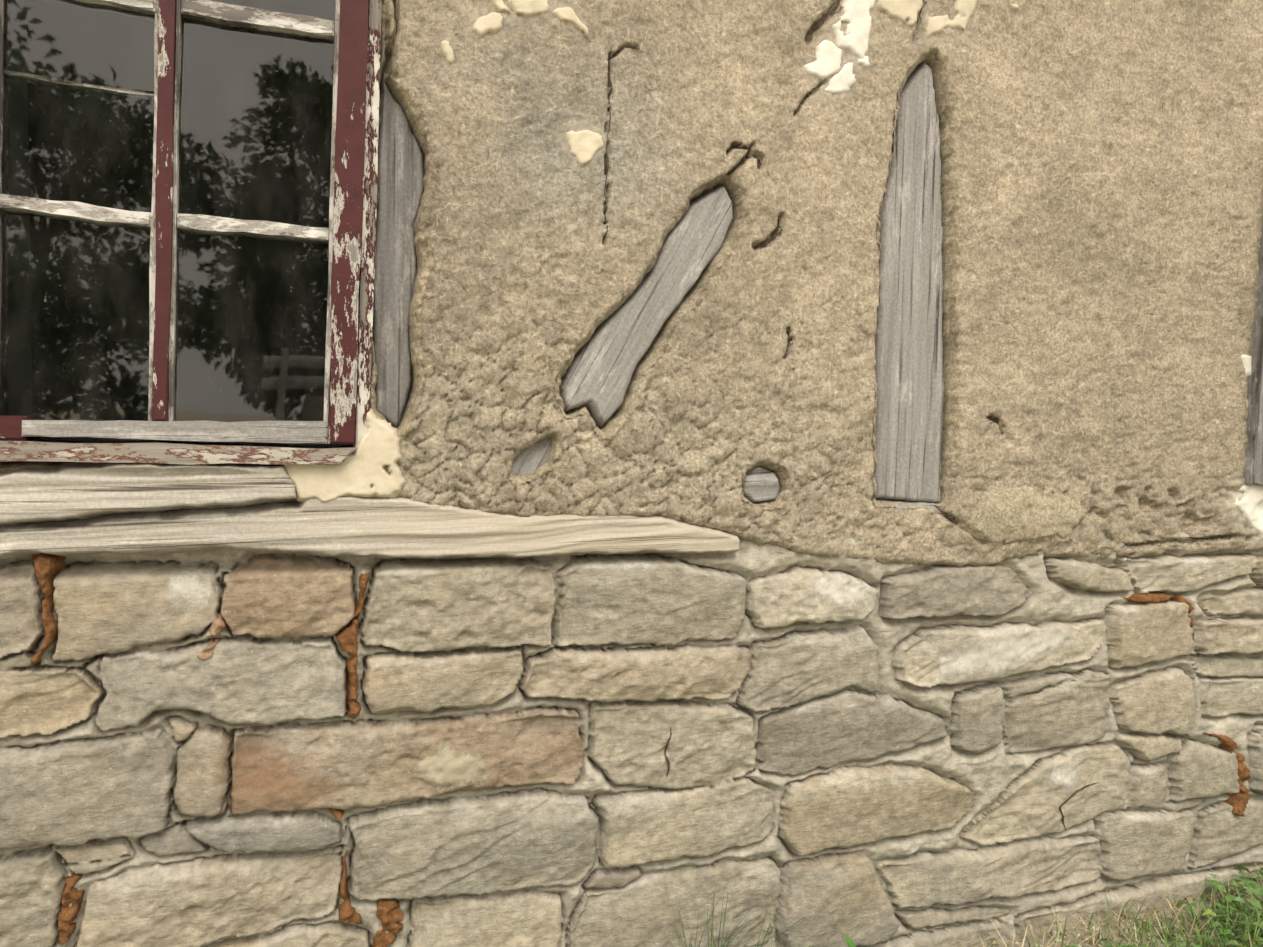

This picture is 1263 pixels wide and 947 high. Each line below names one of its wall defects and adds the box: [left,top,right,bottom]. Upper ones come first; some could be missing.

flaking render [379,0,427,144]
peeling [441,40,455,65]
peeling [473,0,591,42]
peeling [566,124,608,168]
crack [602,48,636,240]
peeling [802,0,977,337]
peeling [282,160,439,502]
flaking render [934,84,961,485]
flaking render [872,365,957,511]
peeling [1221,476,1263,550]